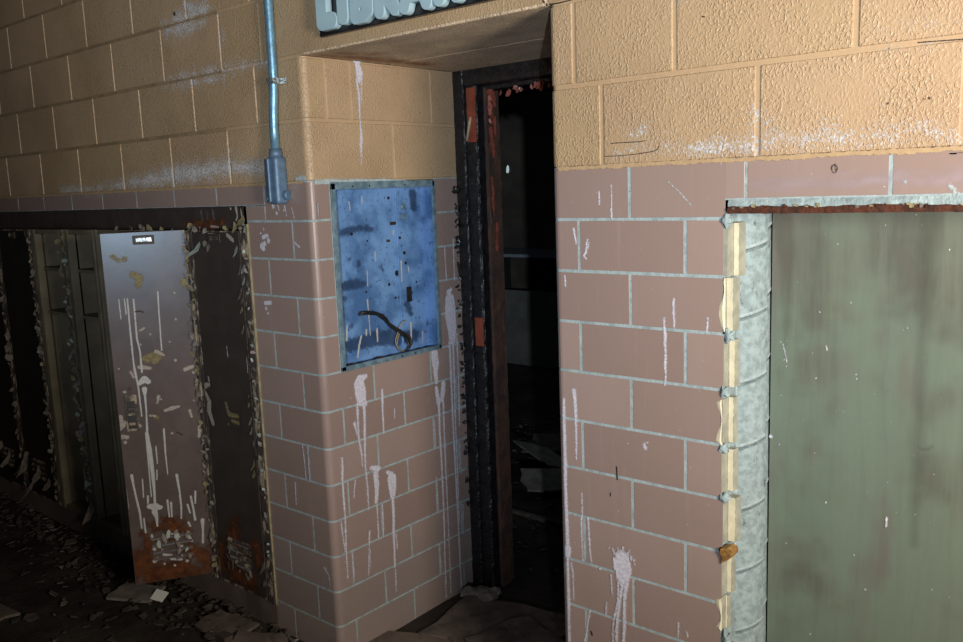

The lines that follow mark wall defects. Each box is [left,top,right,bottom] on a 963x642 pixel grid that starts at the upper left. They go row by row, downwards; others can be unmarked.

efflorescence [161,0,220,41]
peeling [487,80,554,123]
efflorescence [659,102,958,157]
efflorescence [60,148,265,197]
corrosion [134,516,263,590]